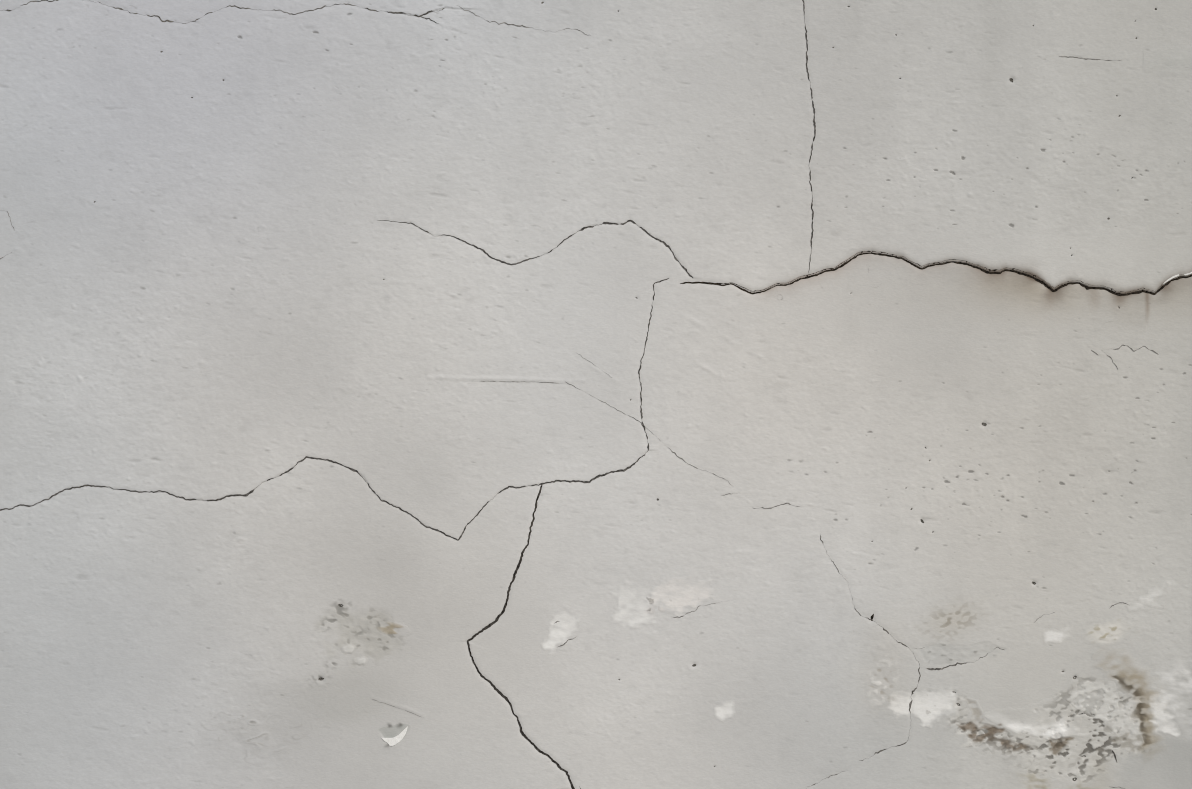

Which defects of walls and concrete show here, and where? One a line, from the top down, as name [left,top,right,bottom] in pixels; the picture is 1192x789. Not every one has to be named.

crack [95,2,587,35]
crack [380,0,1192,296]
leakage [824,271,1192,357]
crack [1091,345,1158,369]
crack [0,278,669,789]
flaking render [311,595,417,674]
flaking render [540,611,581,655]
flaking render [606,571,722,633]
crack [806,536,1004,789]
peeling [377,721,412,750]
flaking render [713,699,736,722]
flaking render [887,645,1192,784]